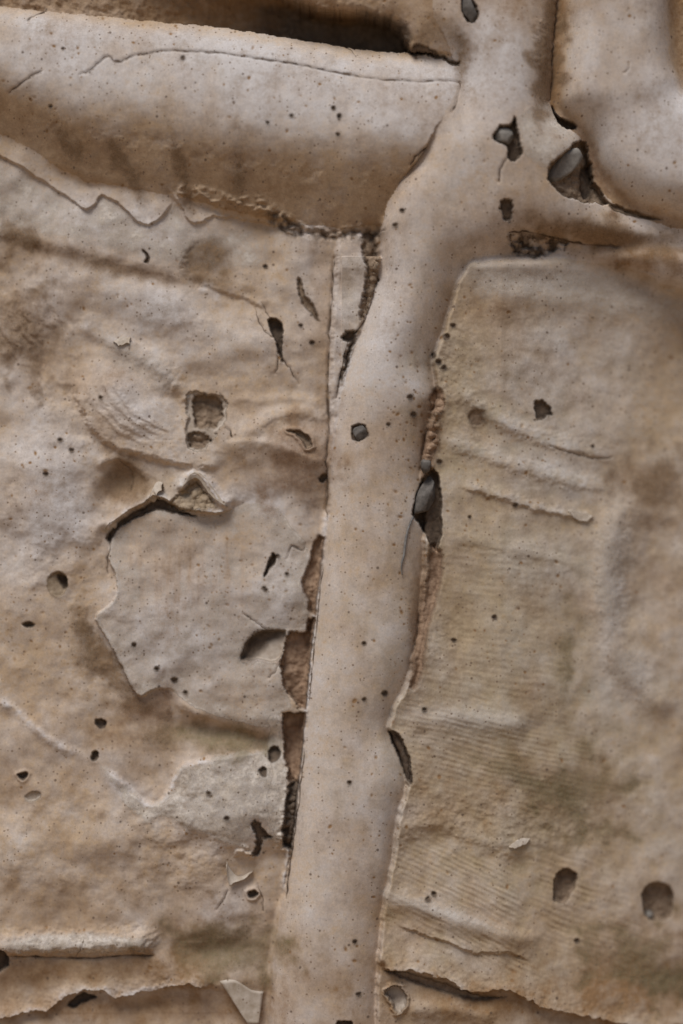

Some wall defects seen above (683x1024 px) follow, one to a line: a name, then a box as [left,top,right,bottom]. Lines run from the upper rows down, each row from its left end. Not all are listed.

crack [83,49,461,109]
leakage [4,224,39,250]
spalling [510,233,567,258]
crack [325,258,375,515]
flaking render [96,472,324,856]